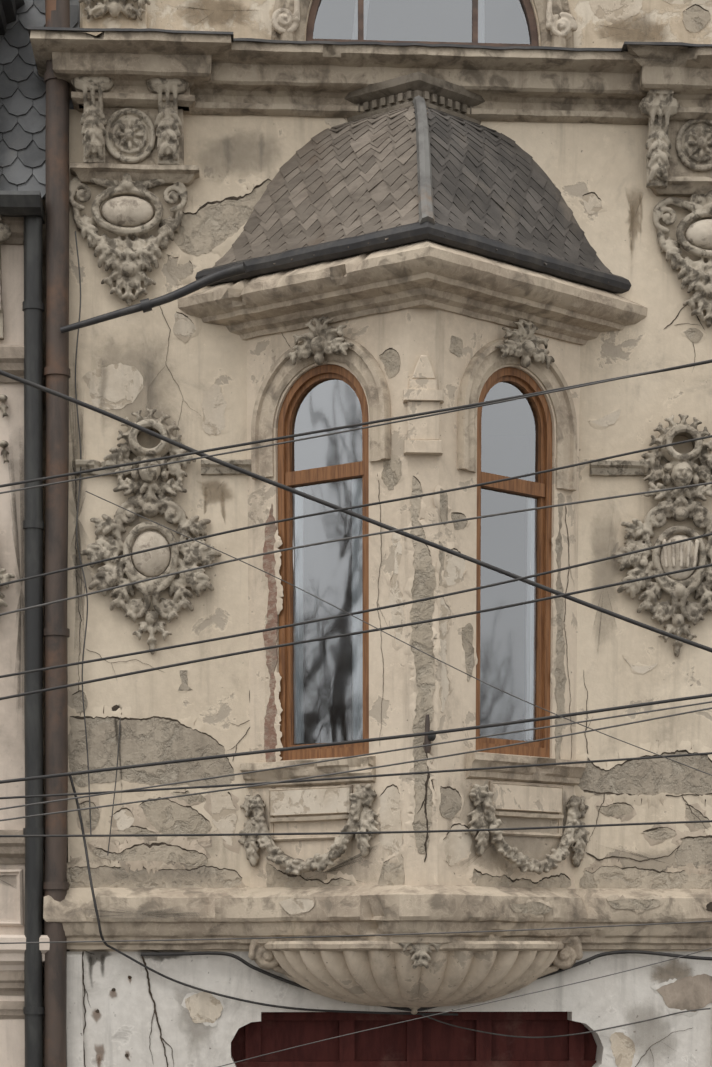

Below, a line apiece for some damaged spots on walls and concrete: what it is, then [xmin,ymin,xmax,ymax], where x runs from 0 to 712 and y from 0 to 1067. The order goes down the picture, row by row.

flaking render [589,0,644,31]
flaking render [681,4,712,39]
flaking render [258,503,284,762]
flaking render [374,454,712,918]
flaking render [67,690,245,888]
water stain [86,950,109,975]
crack [142,956,174,1067]
flaking render [179,989,226,1029]
flaking render [650,970,712,1017]
flaking render [606,1028,638,1067]